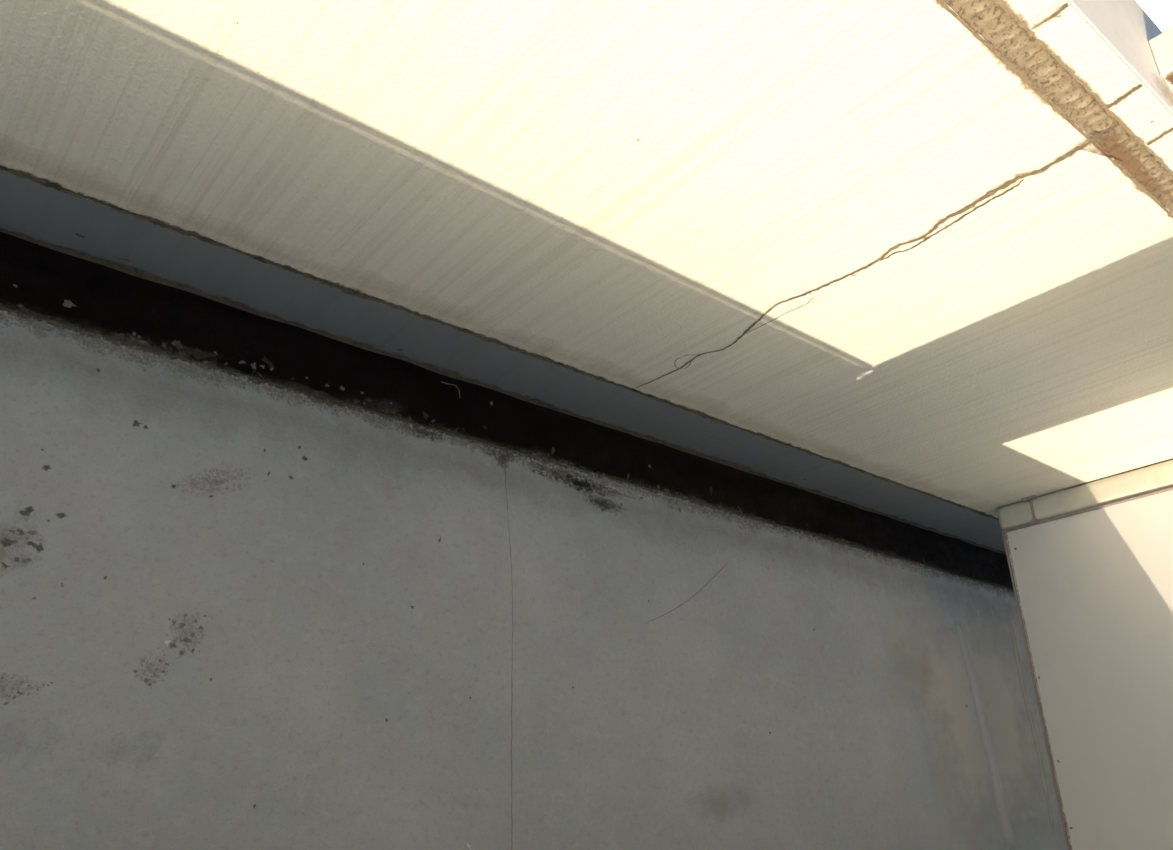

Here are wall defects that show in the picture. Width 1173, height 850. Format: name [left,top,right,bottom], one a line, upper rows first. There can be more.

crack [636,84,1143,388]
damp [0,229,1006,554]
damp [2,529,44,568]